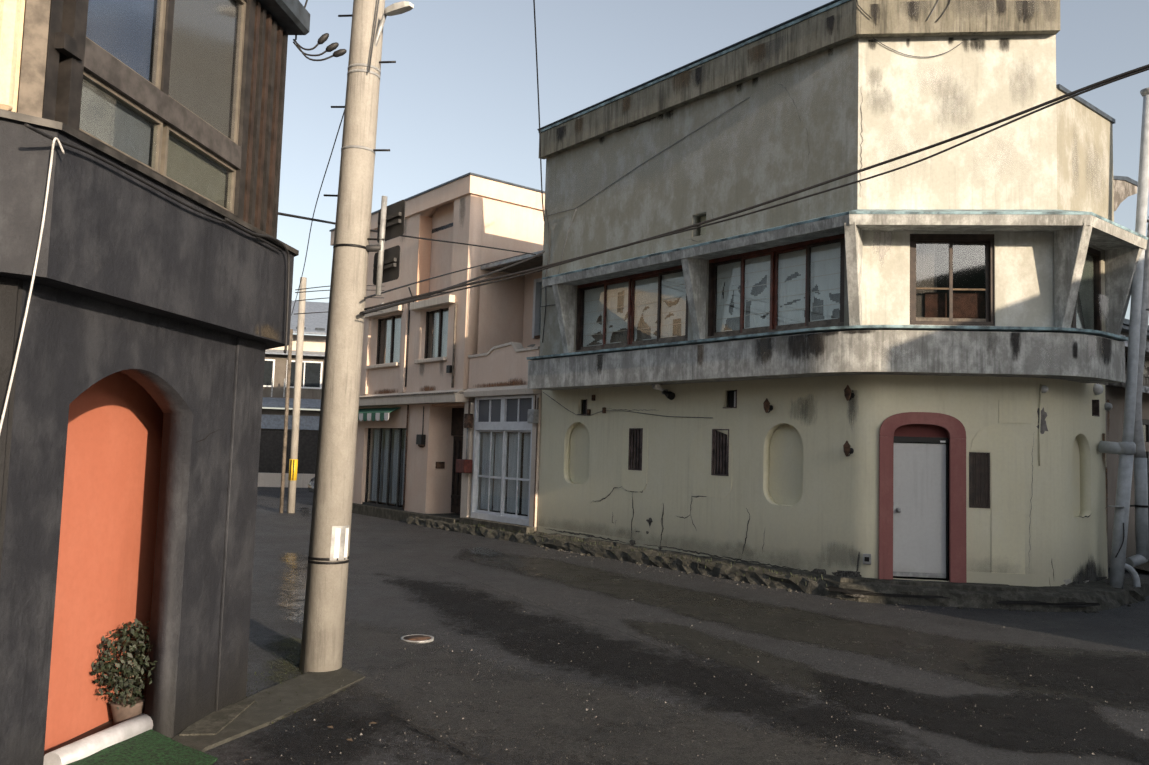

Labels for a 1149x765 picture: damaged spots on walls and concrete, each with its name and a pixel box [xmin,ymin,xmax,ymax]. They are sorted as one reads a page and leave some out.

damp [908,1,919,20]
damp [997,0,1034,19]
damp [948,37,985,49]
damp [757,338,773,361]
damp [788,330,870,359]
damp [1011,333,1020,357]
damp [1073,336,1112,365]
crack [546,484,810,572]